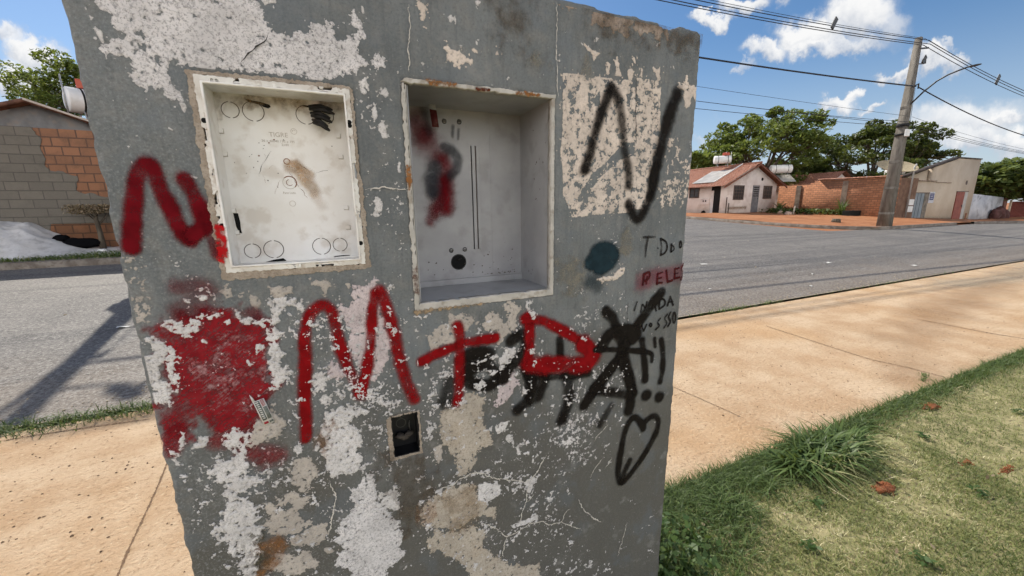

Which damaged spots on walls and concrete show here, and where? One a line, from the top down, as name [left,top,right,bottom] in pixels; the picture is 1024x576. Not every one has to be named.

peeling [84,0,407,257]
peeling [677,75,697,108]
peeling [122,12,691,576]